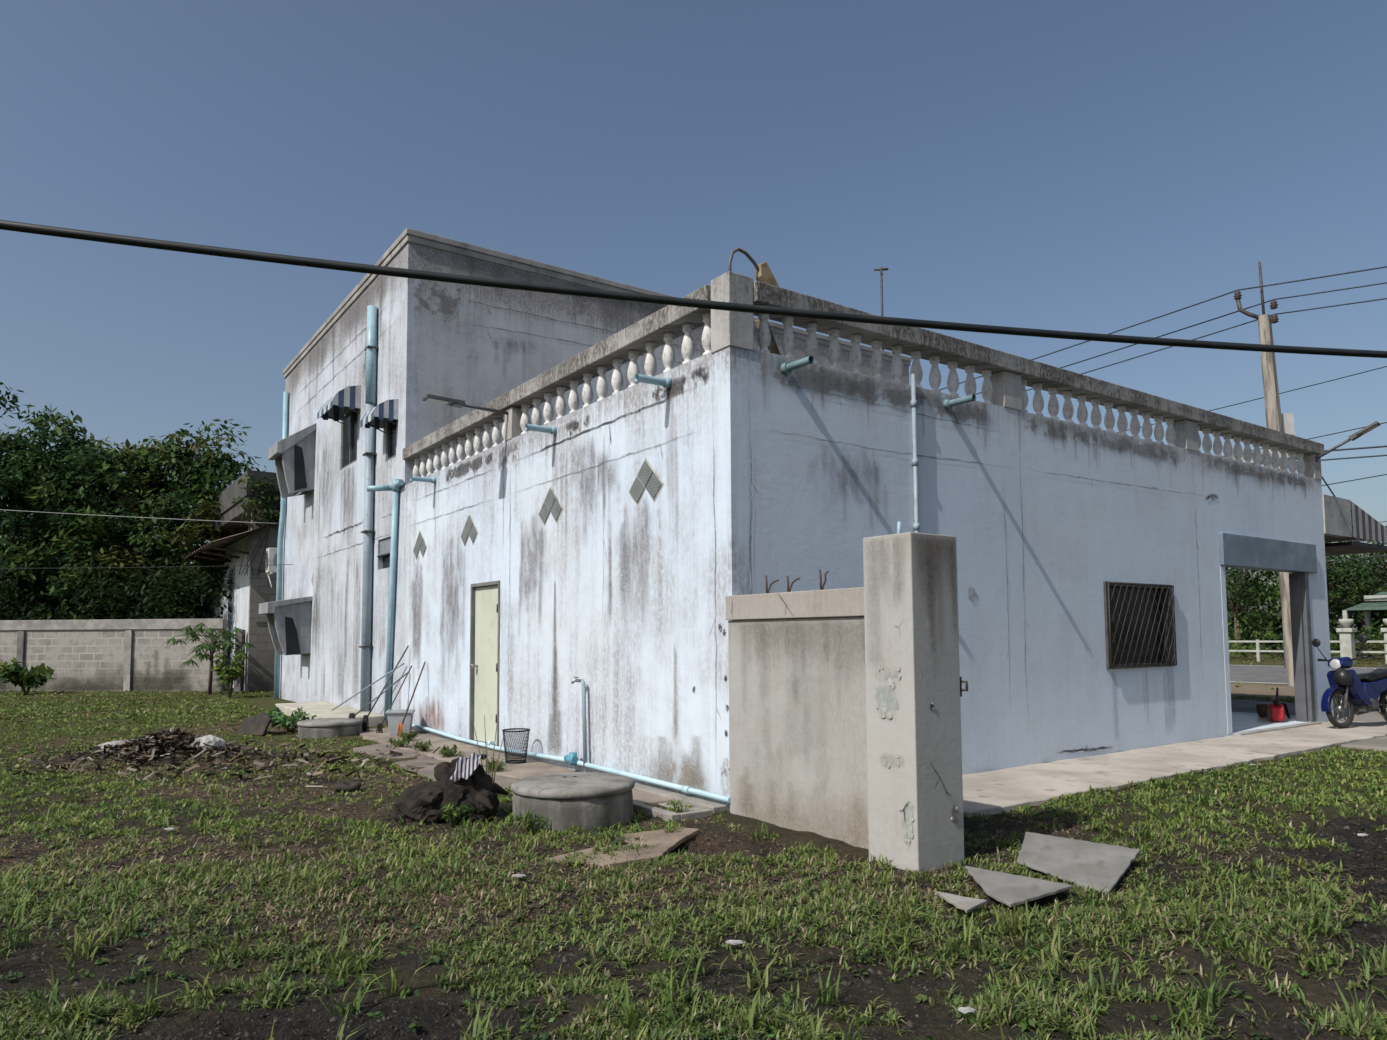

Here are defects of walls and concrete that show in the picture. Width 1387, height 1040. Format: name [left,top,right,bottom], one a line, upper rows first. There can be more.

water stain [1031,420,1173,458]
water stain [659,758,703,789]